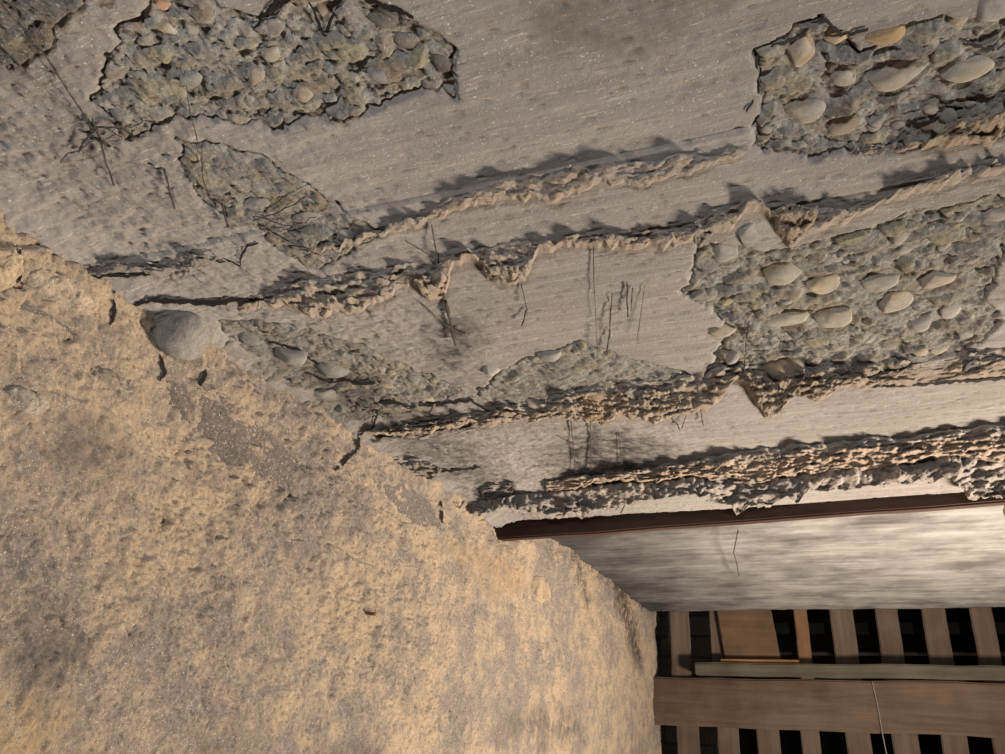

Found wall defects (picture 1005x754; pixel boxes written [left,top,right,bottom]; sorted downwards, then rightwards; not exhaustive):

spalling [0,0,84,69]
spalling [91,0,457,138]
spalling [754,0,1005,155]
spalling [176,136,384,269]
peeling [412,272,451,301]
peeling [482,252,531,286]
spalling [681,194,1005,417]
spalling [218,319,460,421]
spalling [477,339,689,423]
peeling [391,455,442,480]
spalling [457,455,1005,519]